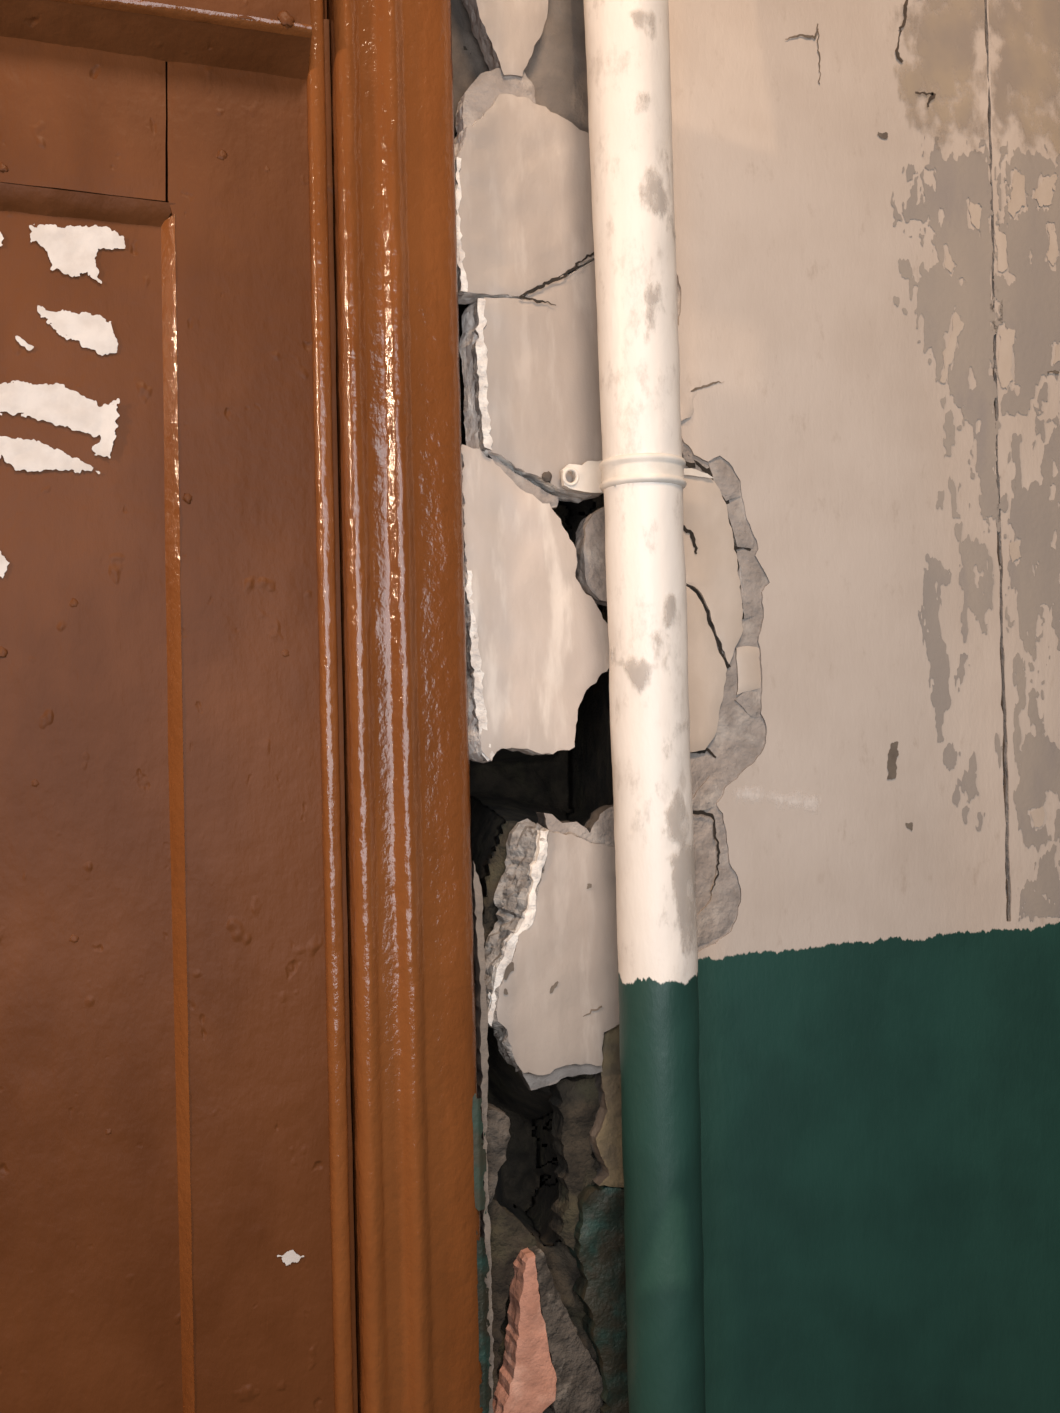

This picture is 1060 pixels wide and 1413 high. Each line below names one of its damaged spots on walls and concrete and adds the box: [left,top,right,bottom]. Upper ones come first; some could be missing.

flaking render [451,0,589,187]
crack [786,23,821,84]
crack [519,252,594,305]
spalling [558,258,595,277]
crack [682,453,751,668]
peeling [891,136,1060,922]
crack [690,748,716,758]
flaking render [682,441,769,951]
crack [999,647,1007,805]
flaking render [457,264,629,1413]
crack [693,810,720,894]
crack [1002,863,1010,921]